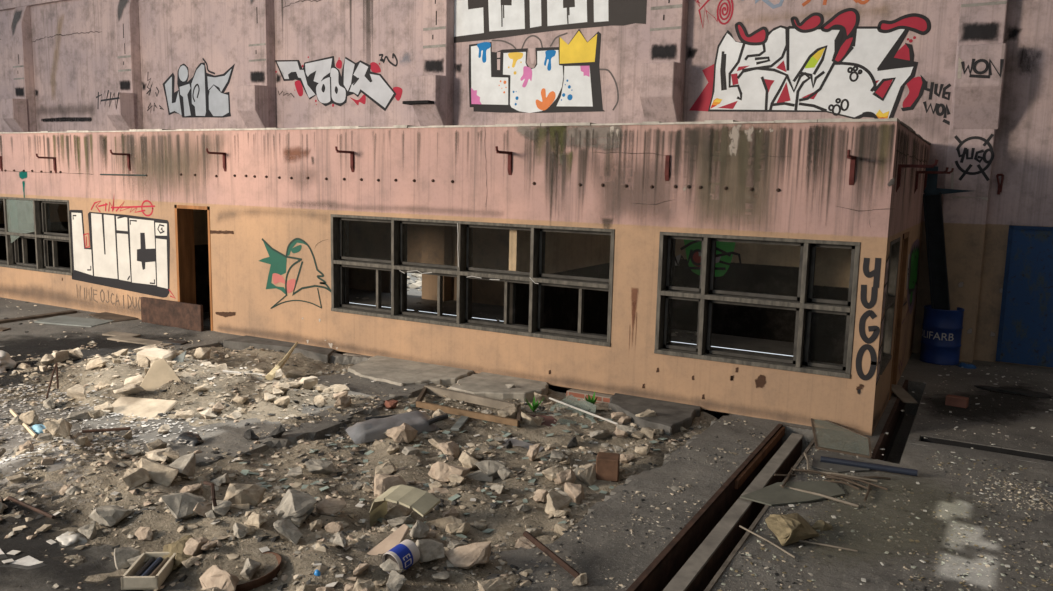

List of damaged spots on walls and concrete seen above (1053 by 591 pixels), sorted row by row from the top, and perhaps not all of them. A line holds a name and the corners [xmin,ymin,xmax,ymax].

leakage [536,126,594,197]
leakage [643,128,769,180]
leakage [782,125,928,186]
corrosion [629,289,638,343]